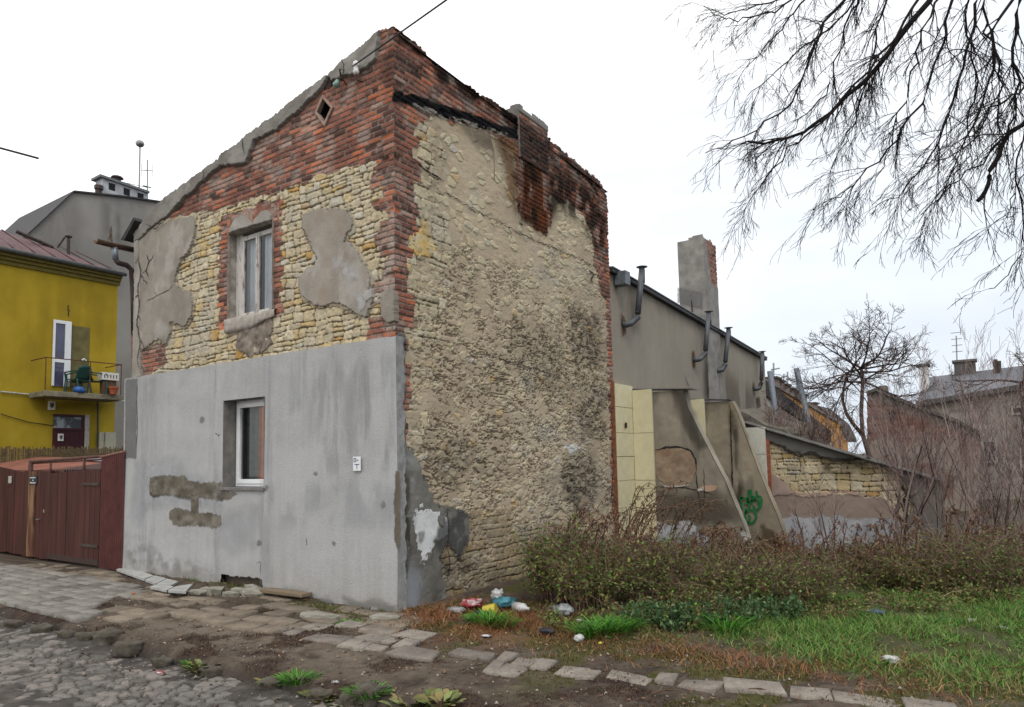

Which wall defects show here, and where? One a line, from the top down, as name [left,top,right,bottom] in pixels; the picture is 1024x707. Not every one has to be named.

peeling [413,103,507,135]
flaking render [228,210,272,235]
spalling [409,228,437,258]
flaking render [139,214,199,351]
flaking render [298,207,399,324]
spalling [235,317,274,358]
spalling [655,446,718,492]
spalling [771,442,877,464]